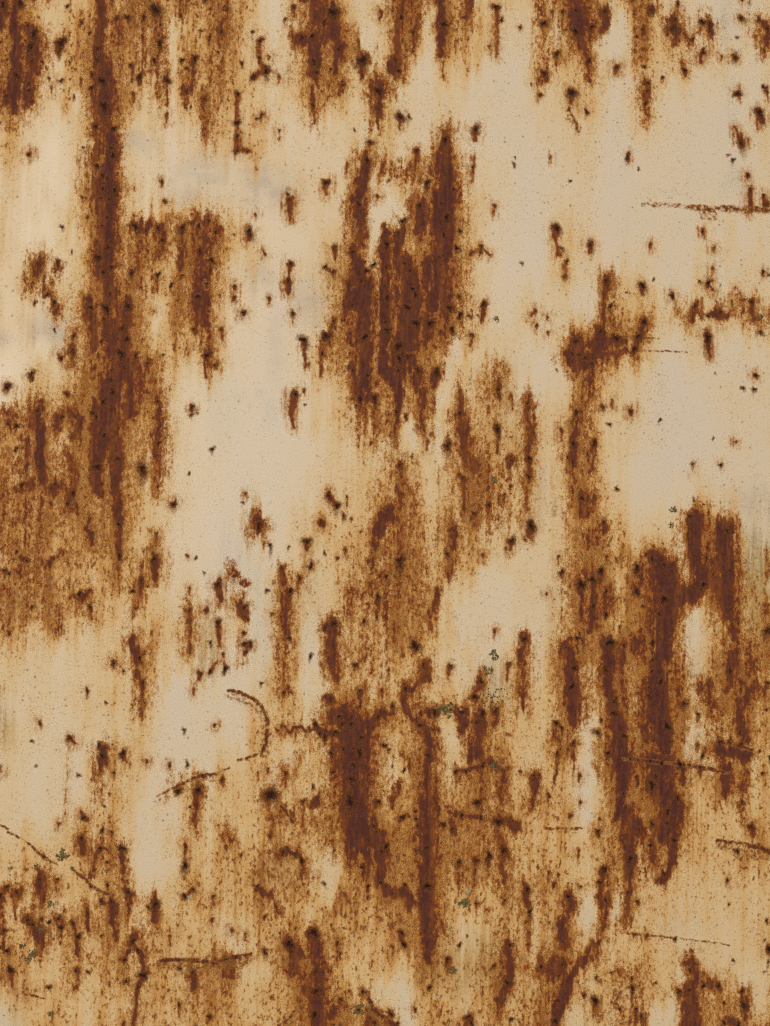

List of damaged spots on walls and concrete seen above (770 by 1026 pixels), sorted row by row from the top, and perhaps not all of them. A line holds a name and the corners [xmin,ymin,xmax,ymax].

corrosion [0,0,281,725]
corrosion [240,0,770,1026]